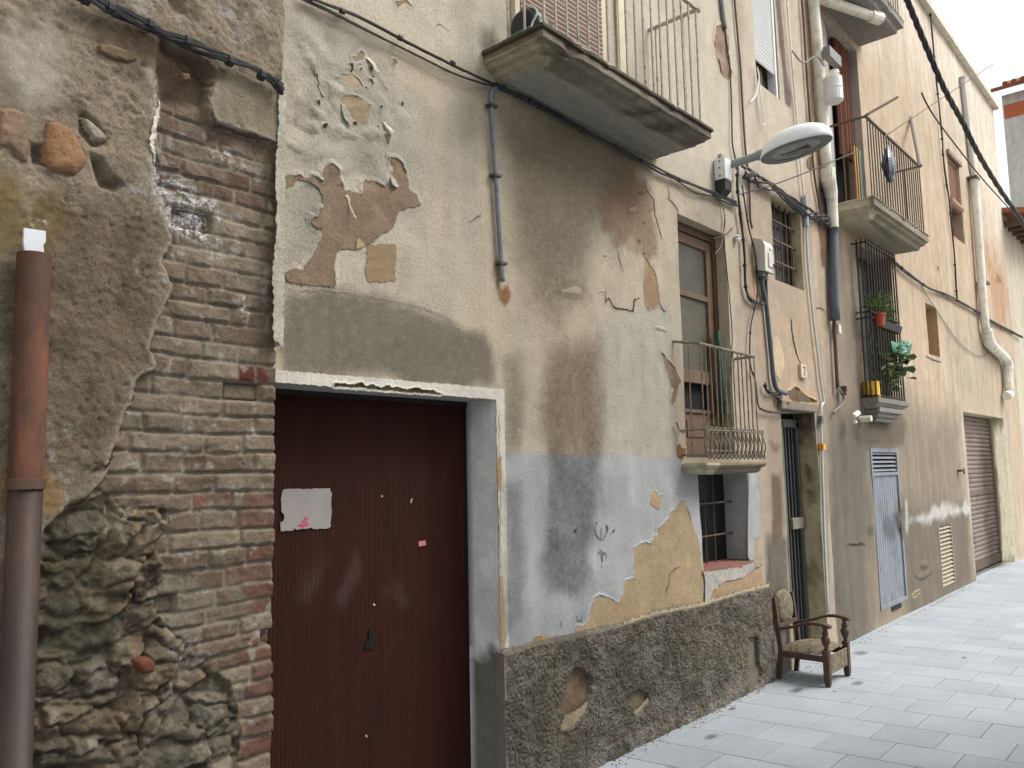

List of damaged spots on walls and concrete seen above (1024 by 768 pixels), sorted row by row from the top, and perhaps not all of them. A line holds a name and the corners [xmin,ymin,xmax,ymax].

efflorescence [152,168,220,243]
corrosion [496,259,510,303]
leakage [514,133,659,307]
crack [604,183,679,314]
flaking render [32,44,425,768]
spalling [332,380,443,397]
leakage [284,288,492,386]
peeling [661,350,682,410]
flaking render [786,384,818,404]
peeling [574,489,764,632]